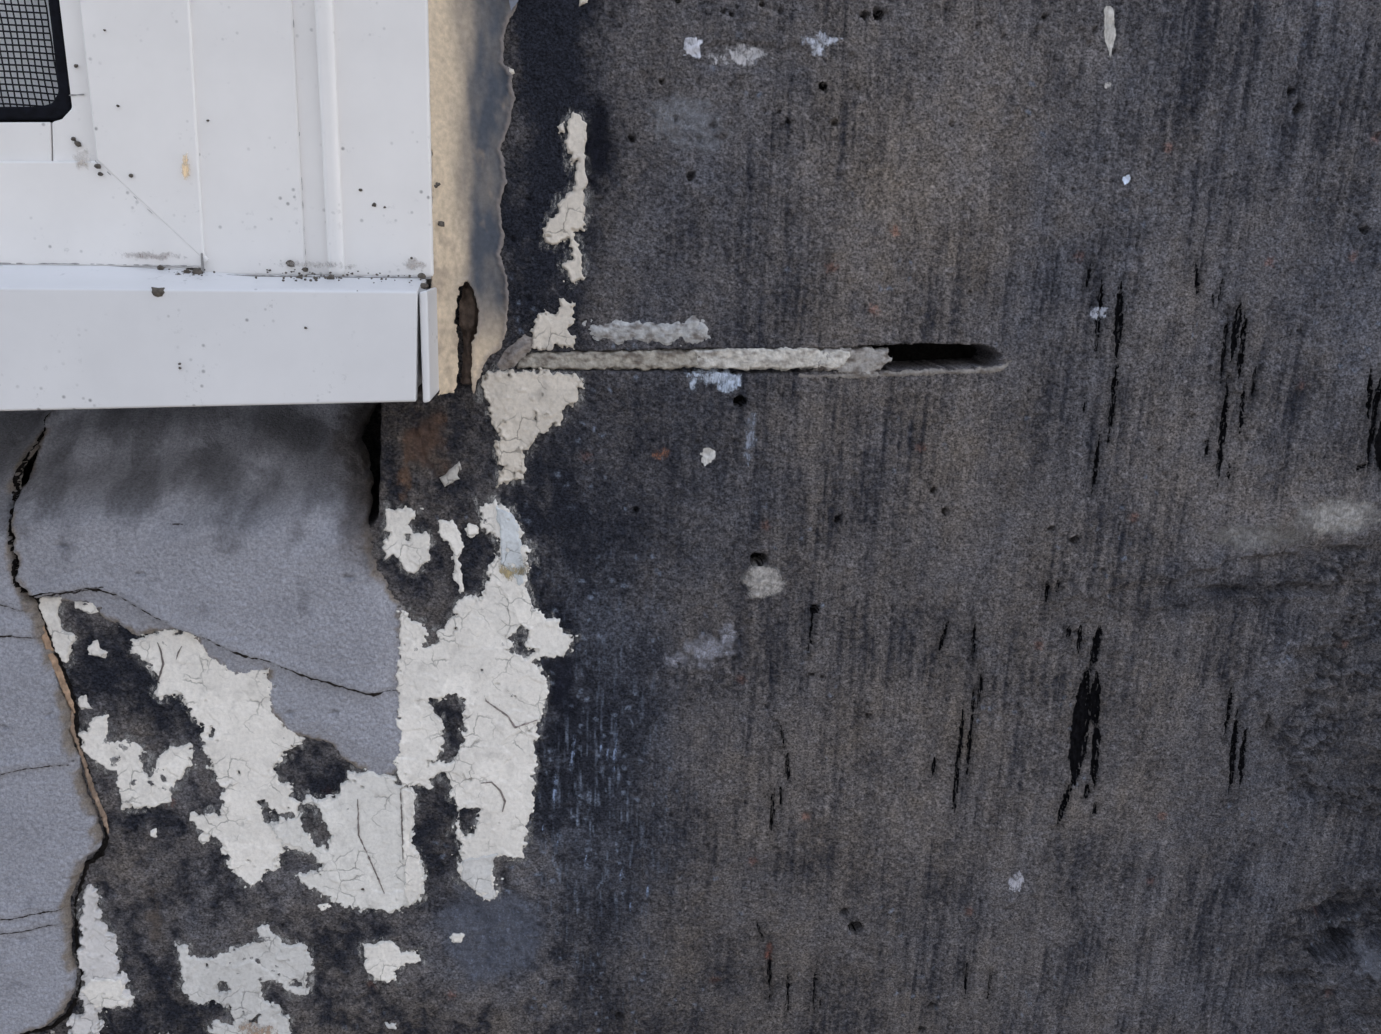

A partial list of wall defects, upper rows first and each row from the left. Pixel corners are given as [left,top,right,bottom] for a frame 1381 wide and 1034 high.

peeling [78,109,593,919]
peeling [39,596,108,670]
crack [0,413,396,1034]
crack [357,789,404,894]
peeling [172,921,316,1034]
peeling [357,937,427,984]
peeling [449,933,464,943]